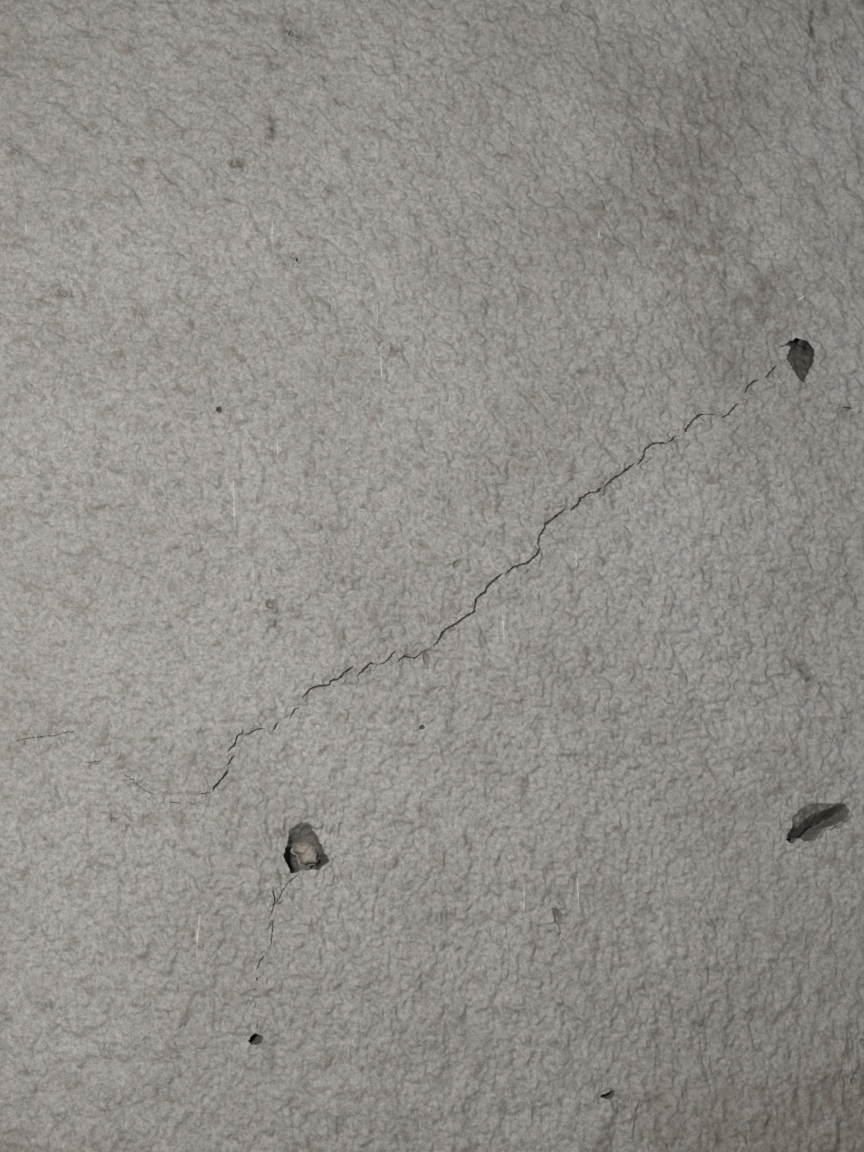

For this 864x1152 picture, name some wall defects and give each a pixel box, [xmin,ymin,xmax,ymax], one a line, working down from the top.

spalling [778,338,814,383]
crack [85,365,777,803]
spalling [284,822,330,873]
spalling [786,802,850,843]